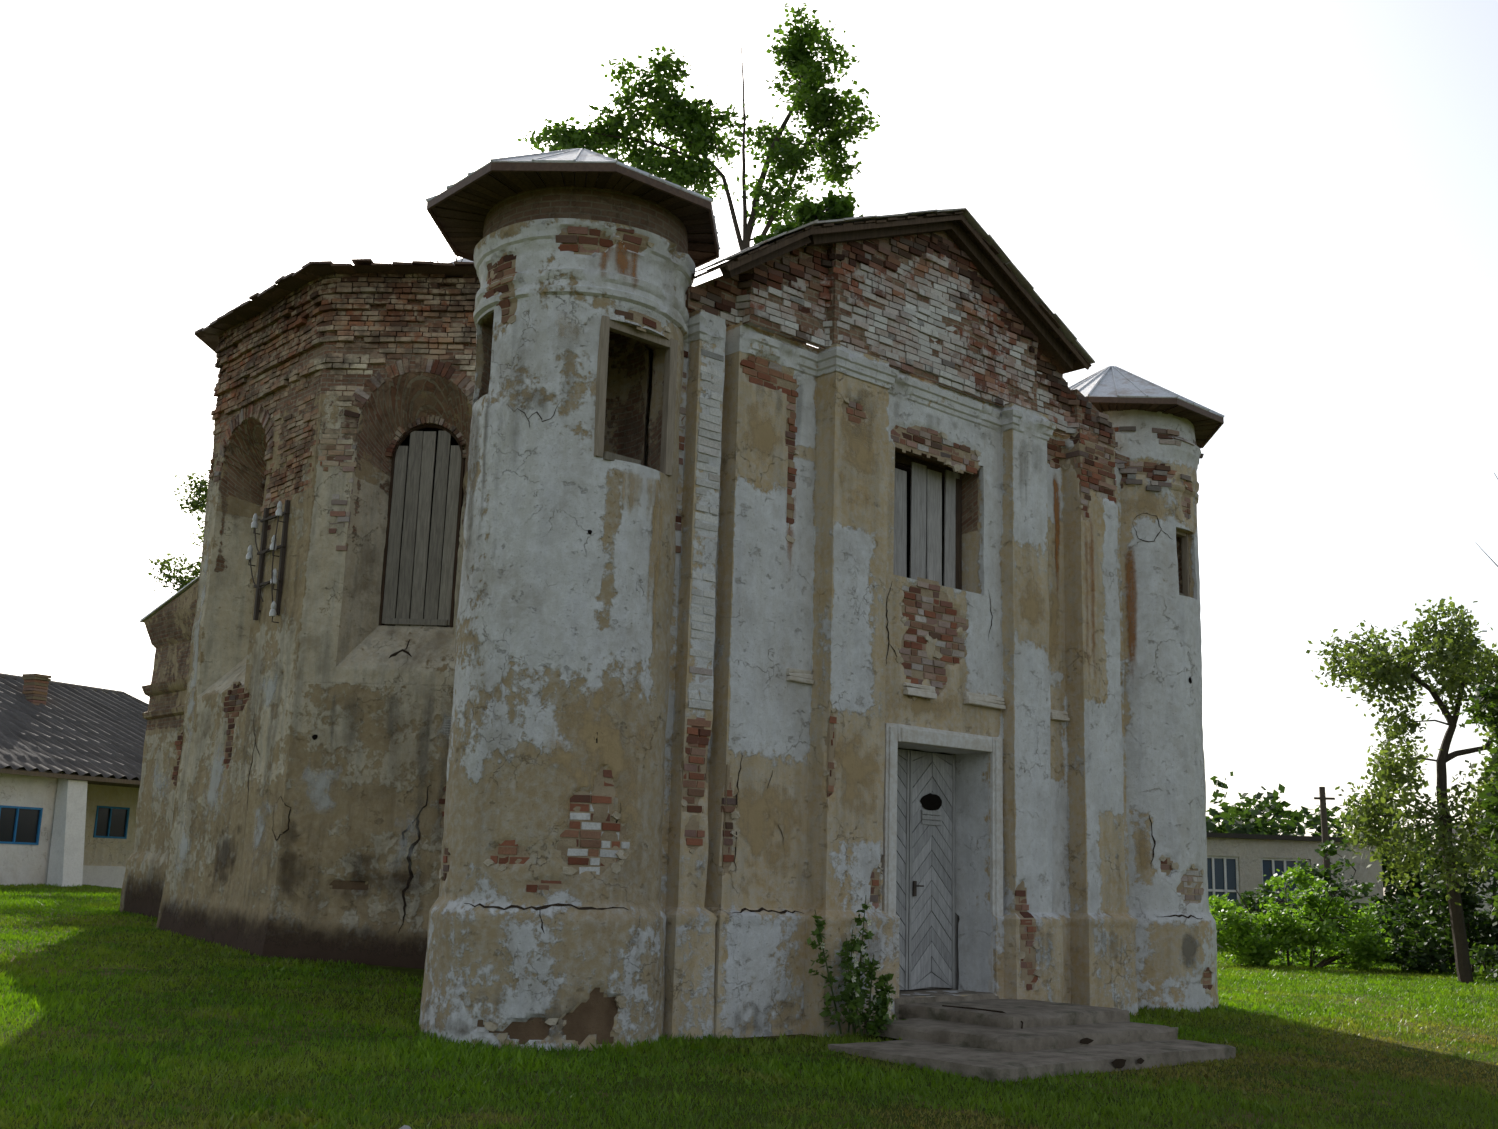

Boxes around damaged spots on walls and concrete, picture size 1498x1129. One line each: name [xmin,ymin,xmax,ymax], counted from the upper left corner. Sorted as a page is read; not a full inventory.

spalling [556,225,654,255]
spalling [895,577,969,714]
spalling [172,723,183,786]
spalling [220,681,251,769]
crack [398,785,431,933]
spalling [483,840,530,871]
spalling [526,766,630,892]
spalling [681,717,708,854]
spalling [721,764,740,873]
water stain [123,880,427,969]
crack [464,903,628,934]
spalling [477,987,628,1045]